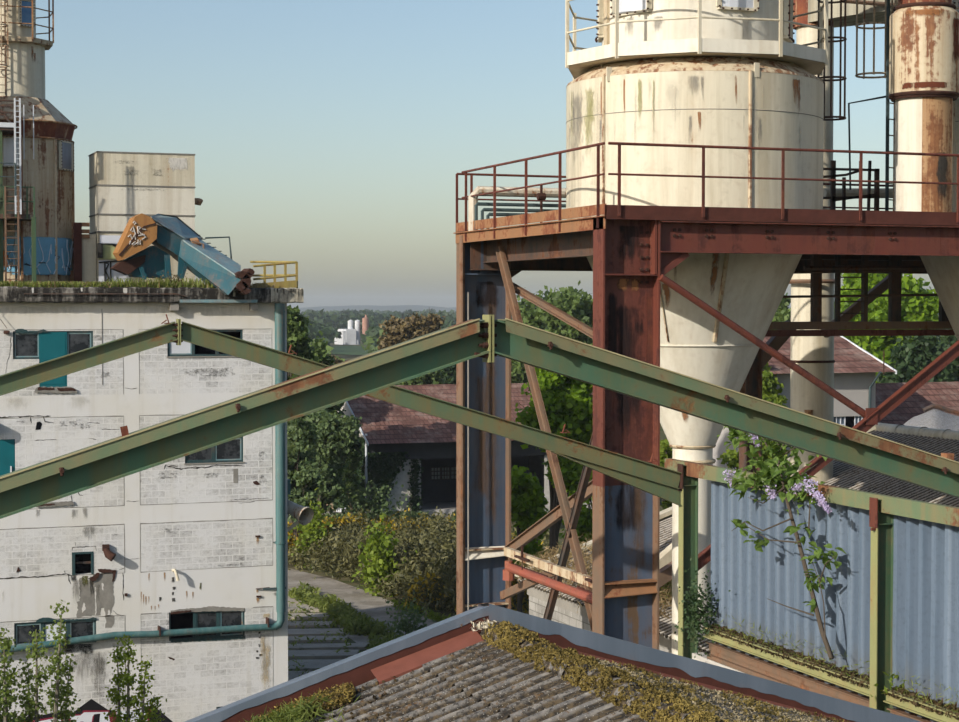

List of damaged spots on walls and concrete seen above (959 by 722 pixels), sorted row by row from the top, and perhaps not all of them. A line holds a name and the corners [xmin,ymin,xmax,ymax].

corrosion [902,82,953,212]
corrosion [608,294,643,359]
corrosion [617,393,639,428]
corrosion [616,482,641,529]
spalling [76,569,116,628]